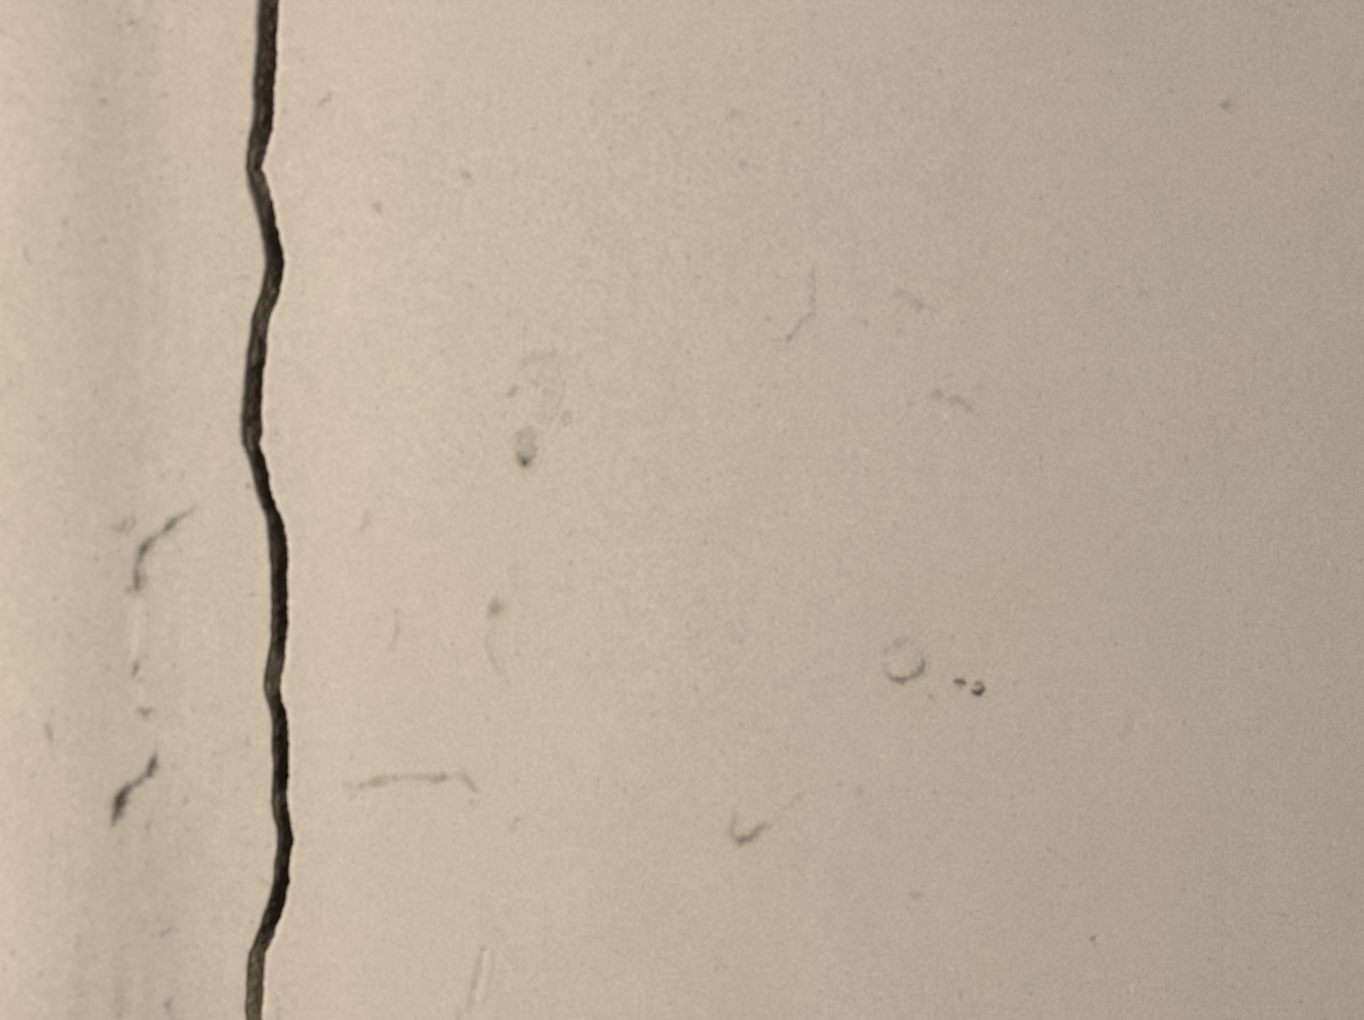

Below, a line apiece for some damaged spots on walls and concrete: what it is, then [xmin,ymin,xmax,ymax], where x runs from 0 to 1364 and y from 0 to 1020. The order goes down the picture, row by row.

crack [237,0,294,1020]